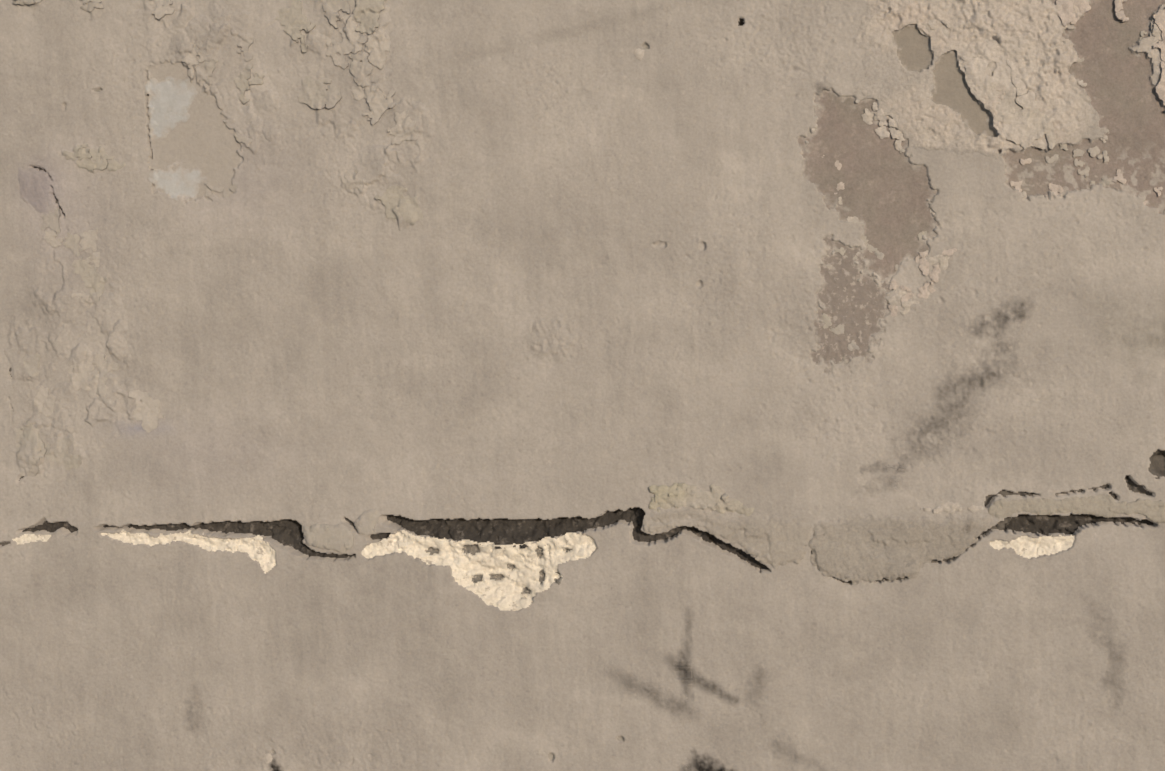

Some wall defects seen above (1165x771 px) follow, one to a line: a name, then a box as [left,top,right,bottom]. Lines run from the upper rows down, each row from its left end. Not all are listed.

peeling [142,0,283,203]
peeling [18,167,101,269]
peeling [798,0,1165,374]
spalling [101,529,276,574]
crack [0,507,769,570]
spalling [361,530,597,611]
crack [832,575,907,583]
spalling [990,535,1075,559]
crack [978,475,1154,540]